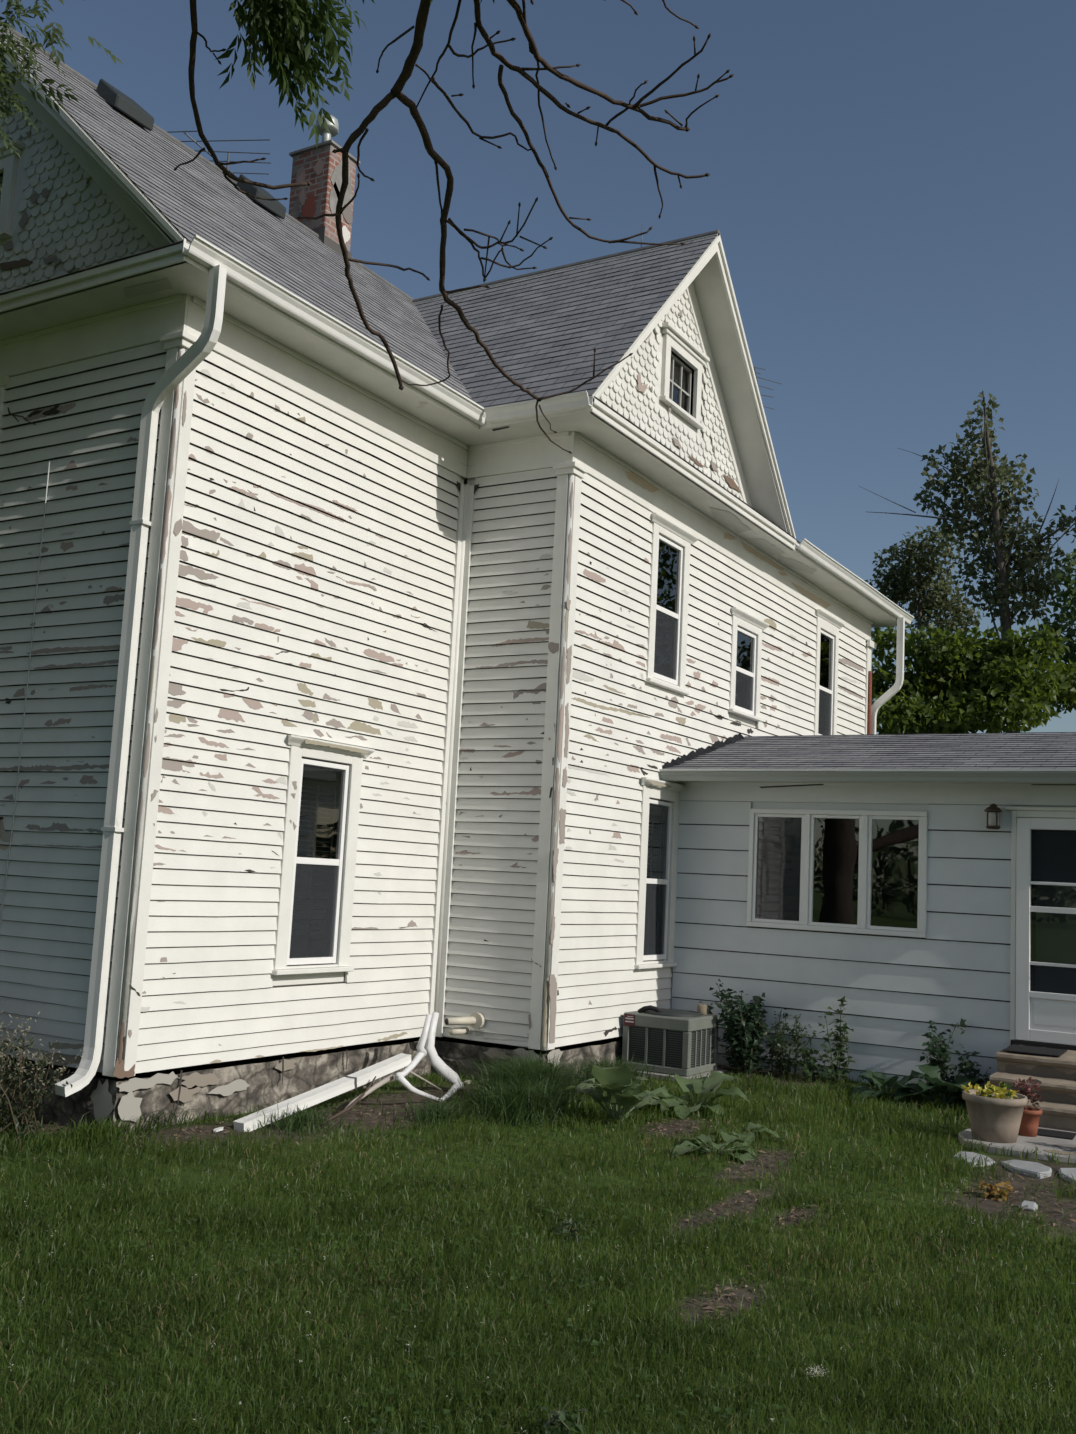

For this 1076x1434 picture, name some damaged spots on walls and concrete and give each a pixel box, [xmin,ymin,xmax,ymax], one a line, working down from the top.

peeling [0,589,120,669]
peeling [136,379,422,866]
peeling [760,618,812,729]
peeling [838,658,864,672]
peeling [0,763,109,800]
peeling [23,822,103,848]